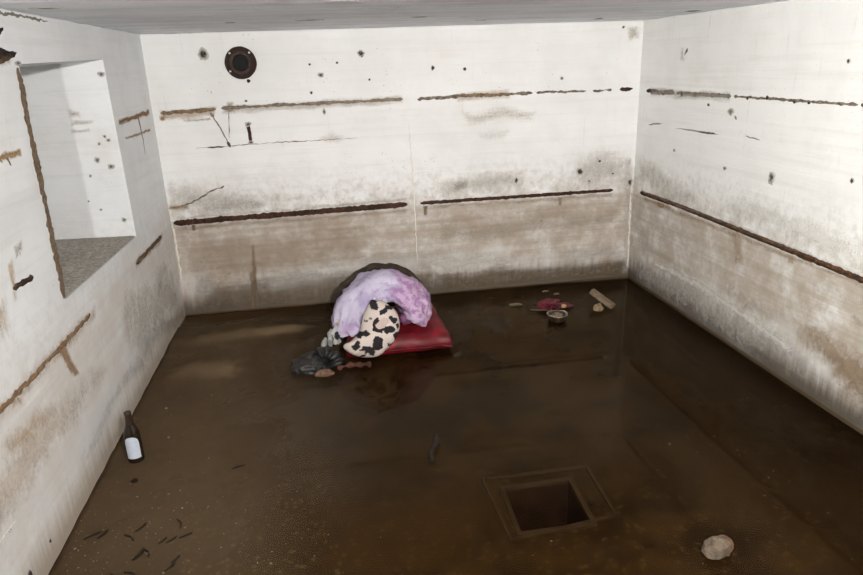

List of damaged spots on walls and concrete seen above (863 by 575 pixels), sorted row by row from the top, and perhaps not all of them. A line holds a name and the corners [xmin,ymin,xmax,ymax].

rust [0,150,21,165]
damp [437,258,625,287]
damp [205,275,350,309]
rust [59,346,78,376]
damp [809,330,863,394]